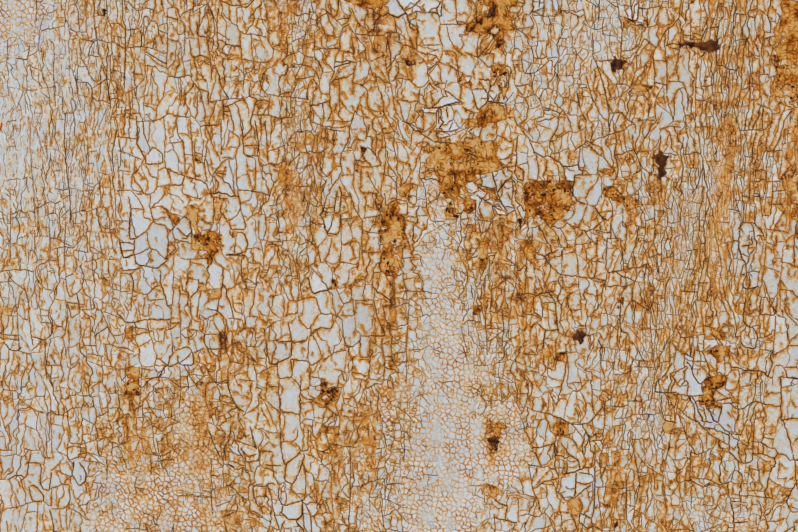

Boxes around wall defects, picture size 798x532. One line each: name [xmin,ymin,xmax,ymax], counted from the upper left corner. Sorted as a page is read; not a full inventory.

peeling [385,0,441,27]
crack [397,0,553,234]
rust [466,0,517,48]
crack [749,0,798,131]
rust [770,0,798,102]
crack [0,39,89,393]
rust [166,205,221,265]
rust [430,63,575,385]
crack [484,0,730,531]
rust [360,183,413,481]
peeling [662,335,741,462]
rust [700,375,726,408]